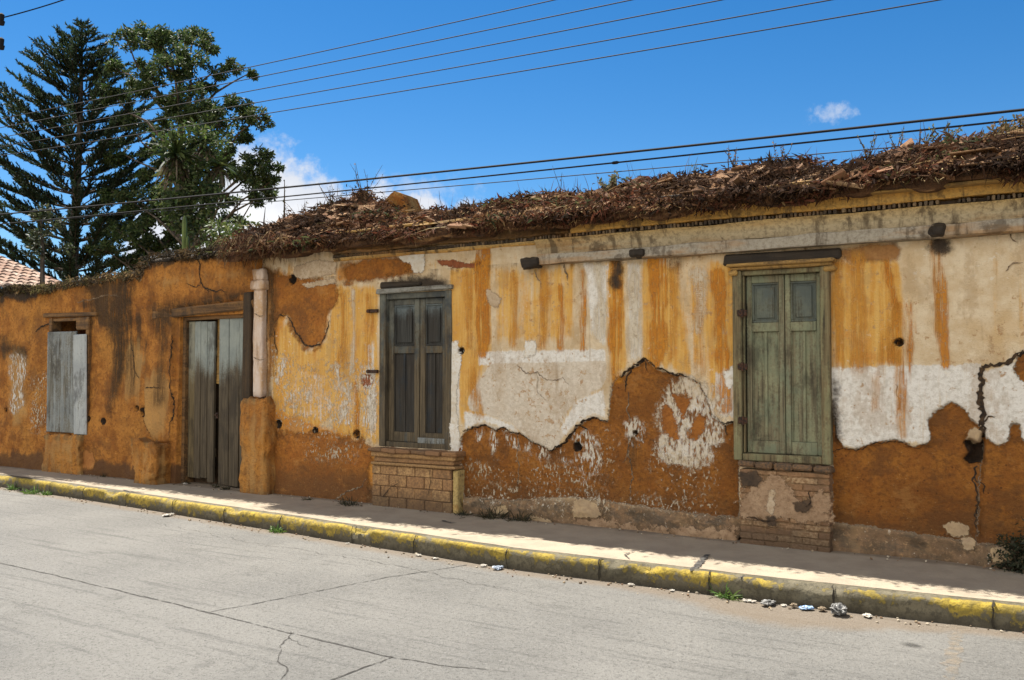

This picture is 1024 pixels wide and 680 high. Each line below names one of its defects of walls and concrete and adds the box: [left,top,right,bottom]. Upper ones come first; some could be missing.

water stain [85,277,133,410]
crack [186,262,224,293]
flaking render [271,254,480,503]
crack [463,357,733,501]
water stain [593,261,642,358]
flaking render [449,341,1024,563]
water stain [842,244,900,263]
water stain [931,239,951,255]
crack [971,463,986,533]
crack [976,350,1024,438]